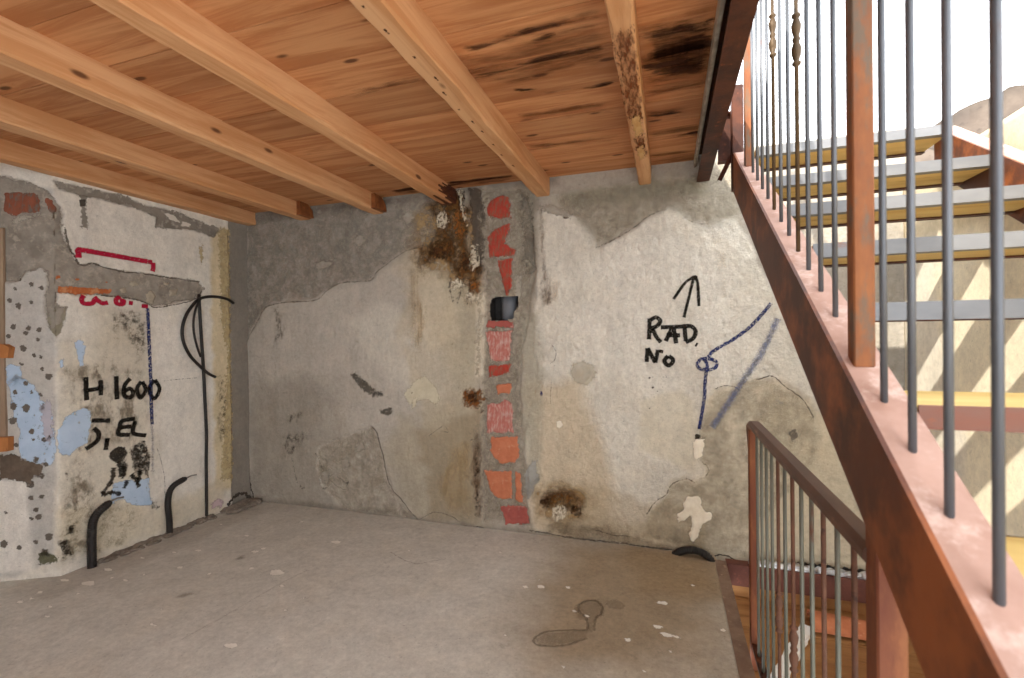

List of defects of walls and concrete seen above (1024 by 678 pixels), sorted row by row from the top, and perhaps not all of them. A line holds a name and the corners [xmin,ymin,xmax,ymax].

leakage [469,18,713,119]
leakage [634,126,699,160]
rust [412,189,482,306]
spalling [0,176,234,520]
rust [462,389,486,413]
leakage [121,434,151,478]
rust [536,486,586,522]